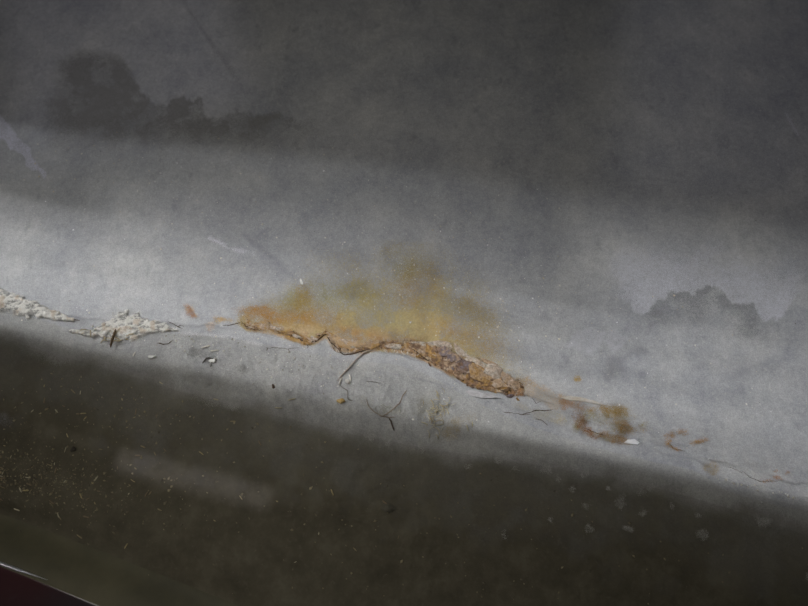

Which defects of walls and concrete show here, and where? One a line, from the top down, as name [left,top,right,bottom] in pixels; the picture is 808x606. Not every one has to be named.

damp [32,47,324,166]
damp [560,235,806,393]
rust [213,315,648,445]